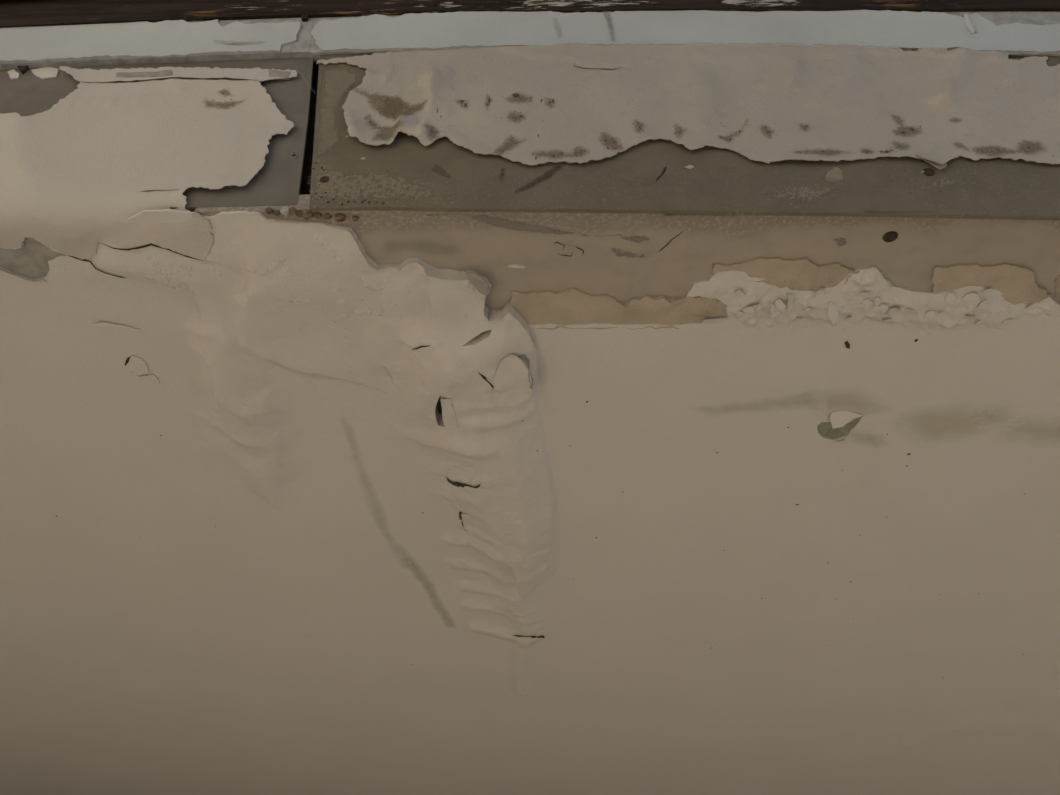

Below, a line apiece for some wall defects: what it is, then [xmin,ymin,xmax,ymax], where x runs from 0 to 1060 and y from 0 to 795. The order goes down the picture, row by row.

peeling [0,10,1060,284]
peeling [817,410,864,445]